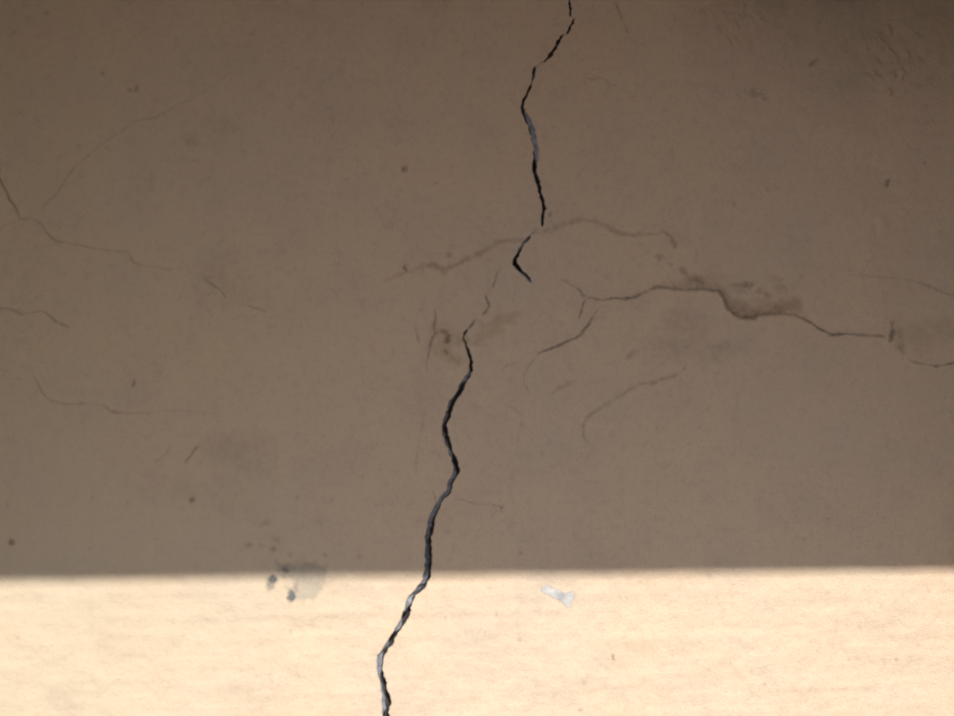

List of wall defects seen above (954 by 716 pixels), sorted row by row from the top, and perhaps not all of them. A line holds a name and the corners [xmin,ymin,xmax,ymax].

crack [512,0,575,283]
crack [376,324,473,716]
peeling [542,585,574,607]